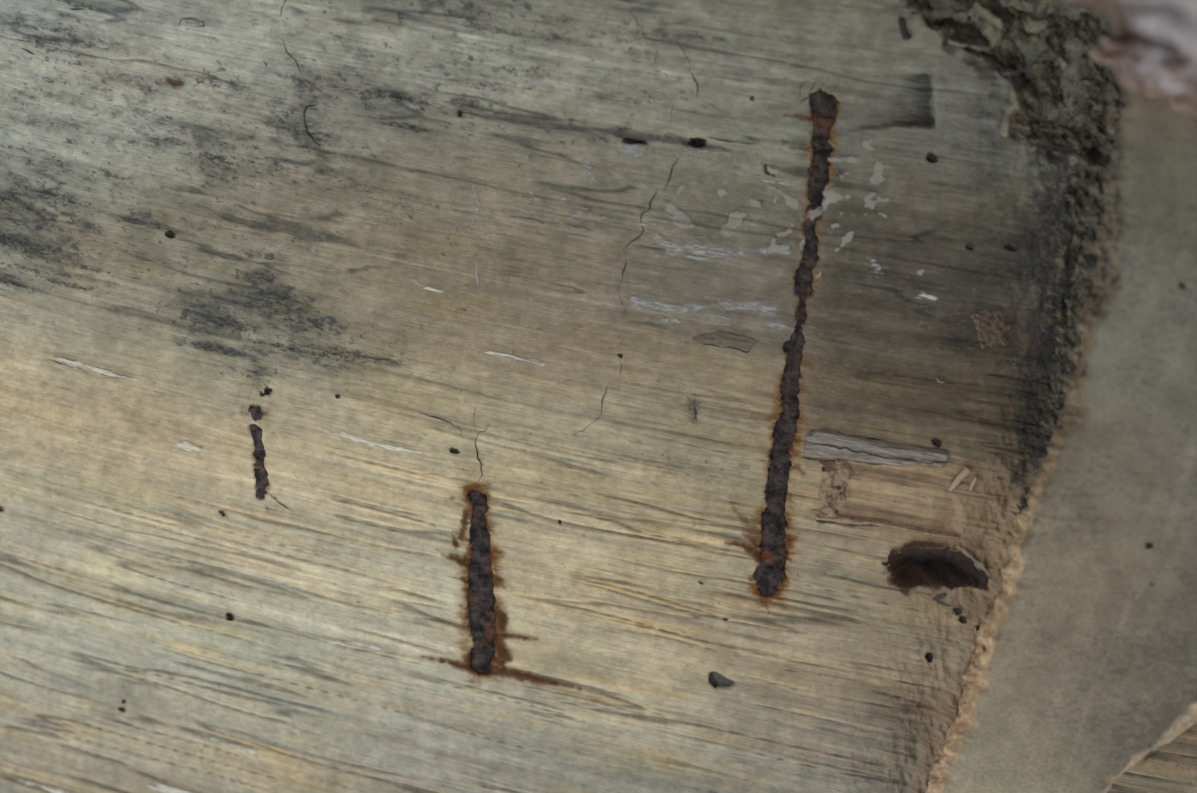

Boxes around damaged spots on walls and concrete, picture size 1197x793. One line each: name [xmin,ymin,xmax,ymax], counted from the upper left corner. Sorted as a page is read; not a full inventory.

corrosion [248,406,269,499]
corrosion [725,91,840,606]
corrosion [422,482,581,690]